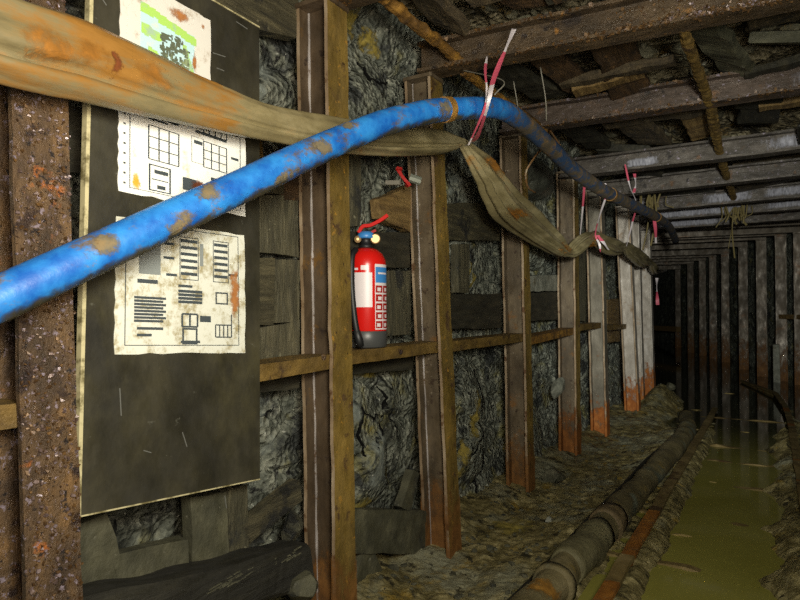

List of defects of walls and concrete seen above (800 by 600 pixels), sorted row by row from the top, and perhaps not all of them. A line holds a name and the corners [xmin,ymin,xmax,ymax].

corrosion [112,51,122,71]
corrosion [12,89,72,257]
corrosion [17,295,84,600]
corrosion [623,363,656,411]